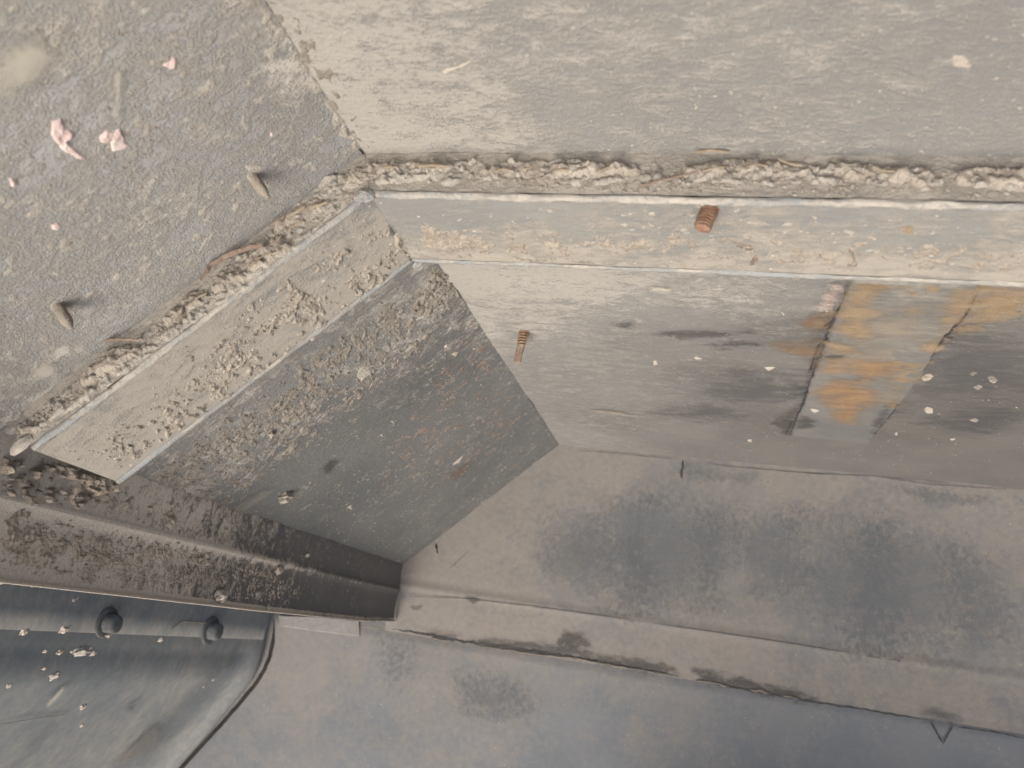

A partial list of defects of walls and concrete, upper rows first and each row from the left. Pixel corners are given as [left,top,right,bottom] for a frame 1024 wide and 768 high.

crack [785,286,847,435]
crack [924,291,979,370]